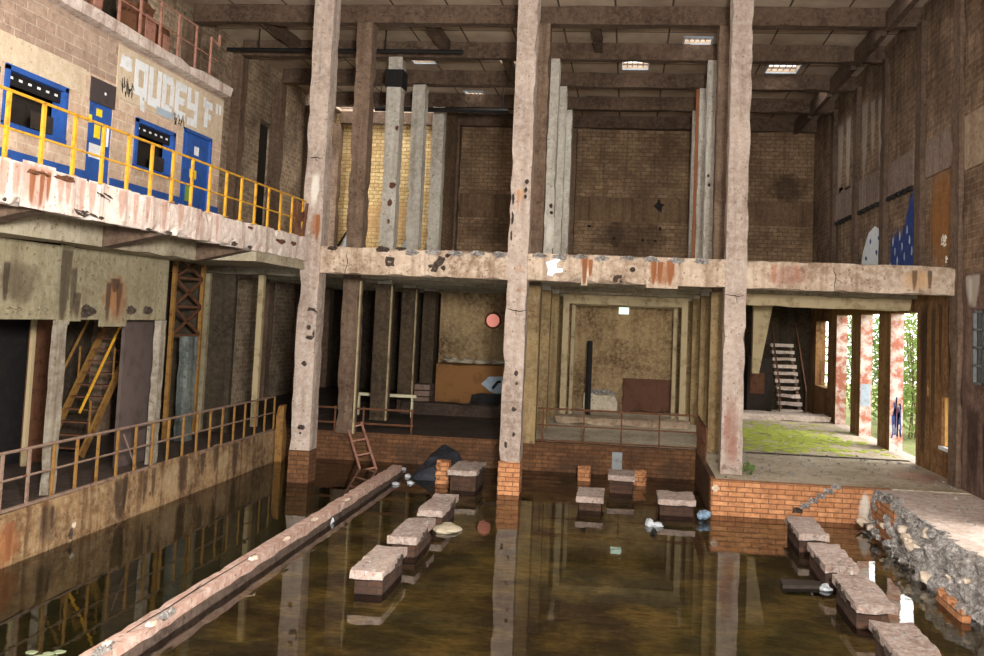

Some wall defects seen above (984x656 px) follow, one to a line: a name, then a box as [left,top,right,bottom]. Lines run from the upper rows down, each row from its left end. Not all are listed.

rust [19,159,56,212]
rust [577,255,595,286]
rust [646,258,679,289]
rust [0,511,30,575]
spalling [855,489,984,634]